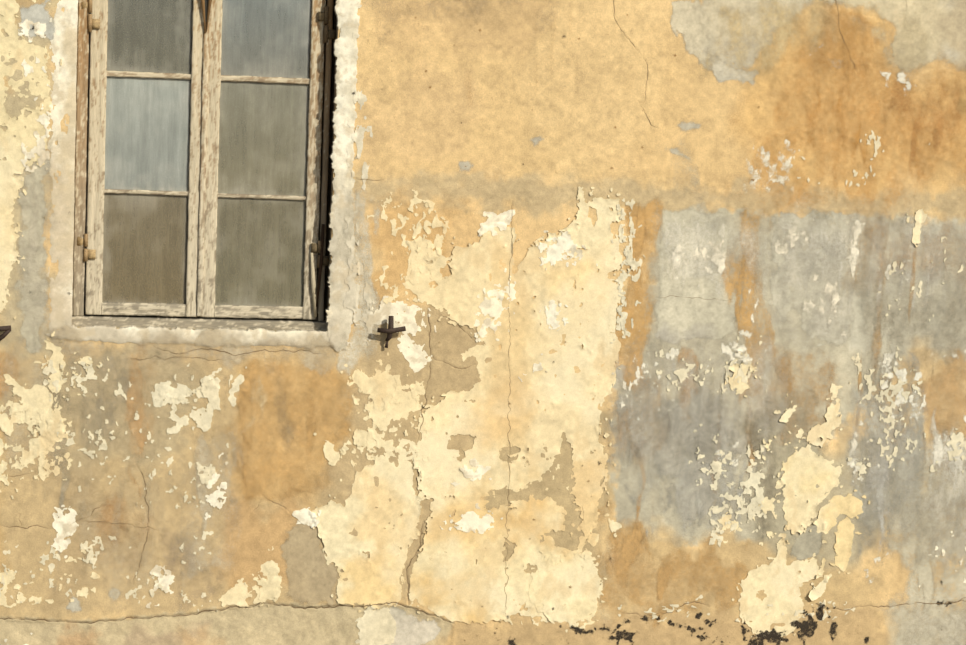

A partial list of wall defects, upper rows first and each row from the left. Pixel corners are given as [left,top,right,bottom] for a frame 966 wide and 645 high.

peeling [0,0,62,313]
flaking render [654,208,766,397]
peeling [845,130,884,187]
peeling [906,209,927,247]
peeling [0,331,134,499]
peeling [0,505,282,613]
peeling [134,363,247,564]
crack [0,524,451,624]
peeling [292,186,645,645]
peeling [644,595,703,622]
leakage [740,603,838,645]
peeling [688,347,926,642]